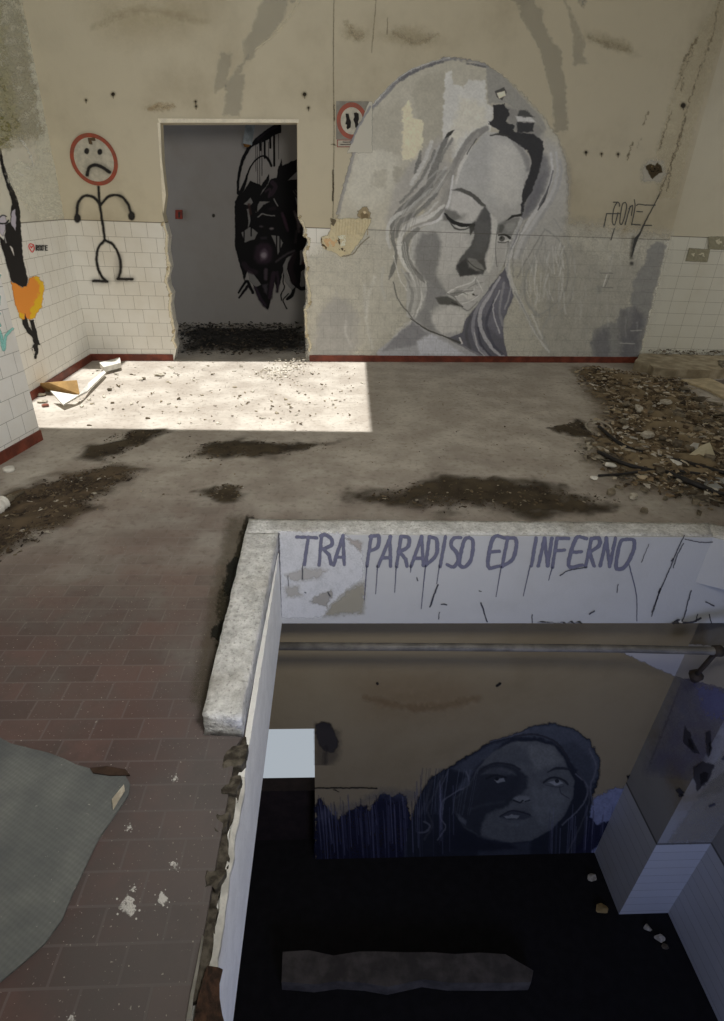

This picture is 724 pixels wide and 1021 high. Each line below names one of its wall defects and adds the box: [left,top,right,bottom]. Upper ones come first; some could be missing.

mould [0,0,42,149]
spalling [298,207,371,352]
peeling [278,531,364,618]